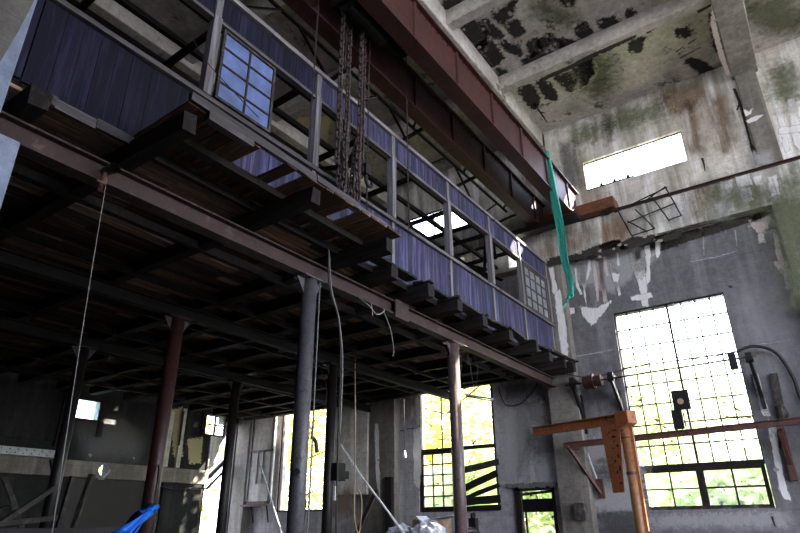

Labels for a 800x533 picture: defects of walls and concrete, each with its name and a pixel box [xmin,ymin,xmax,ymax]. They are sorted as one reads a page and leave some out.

peeling [744,108,763,123]
water stain [771,66,800,152]
peeling [755,153,772,164]
peeling [570,300,612,326]